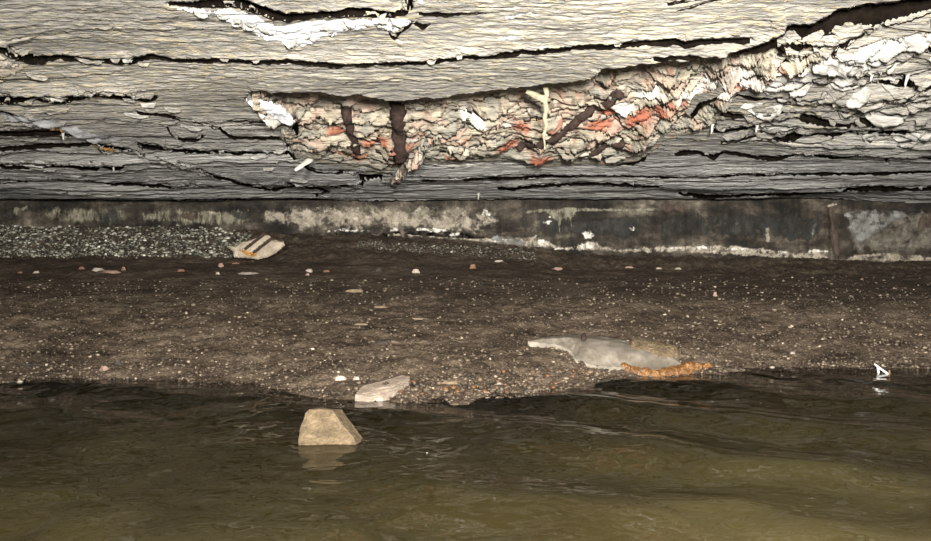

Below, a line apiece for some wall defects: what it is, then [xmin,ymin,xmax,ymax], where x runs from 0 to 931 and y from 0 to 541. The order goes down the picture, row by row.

peeling [177,6,415,49]
crack [0,0,931,259]
spalling [246,32,931,193]
peeling [102,147,214,178]
leakage [47,208,124,224]
leakage [143,209,250,225]
leakage [265,206,828,259]
leakage [844,209,931,262]